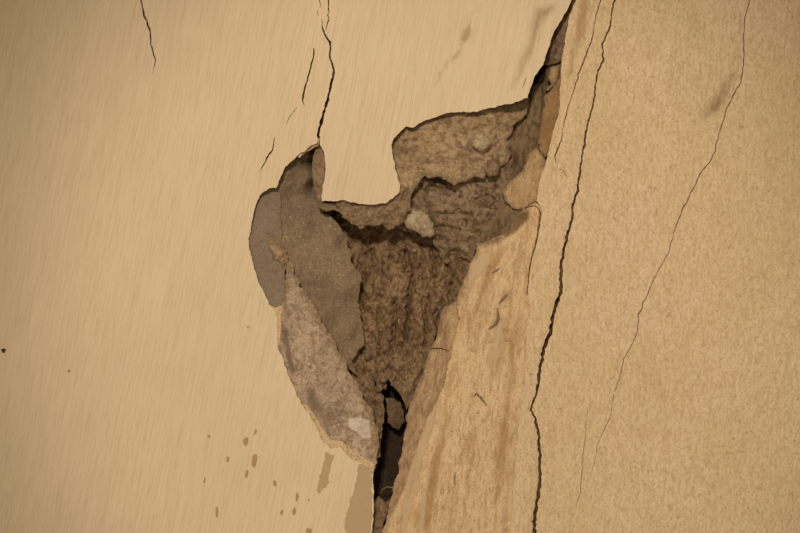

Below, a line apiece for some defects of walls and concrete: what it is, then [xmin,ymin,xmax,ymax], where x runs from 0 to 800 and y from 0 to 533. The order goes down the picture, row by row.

crack [140,0,156,70]
crack [259,0,335,172]
spalling [248,0,576,533]
crack [525,205,541,295]
crack [530,0,616,533]
crack [576,0,750,505]